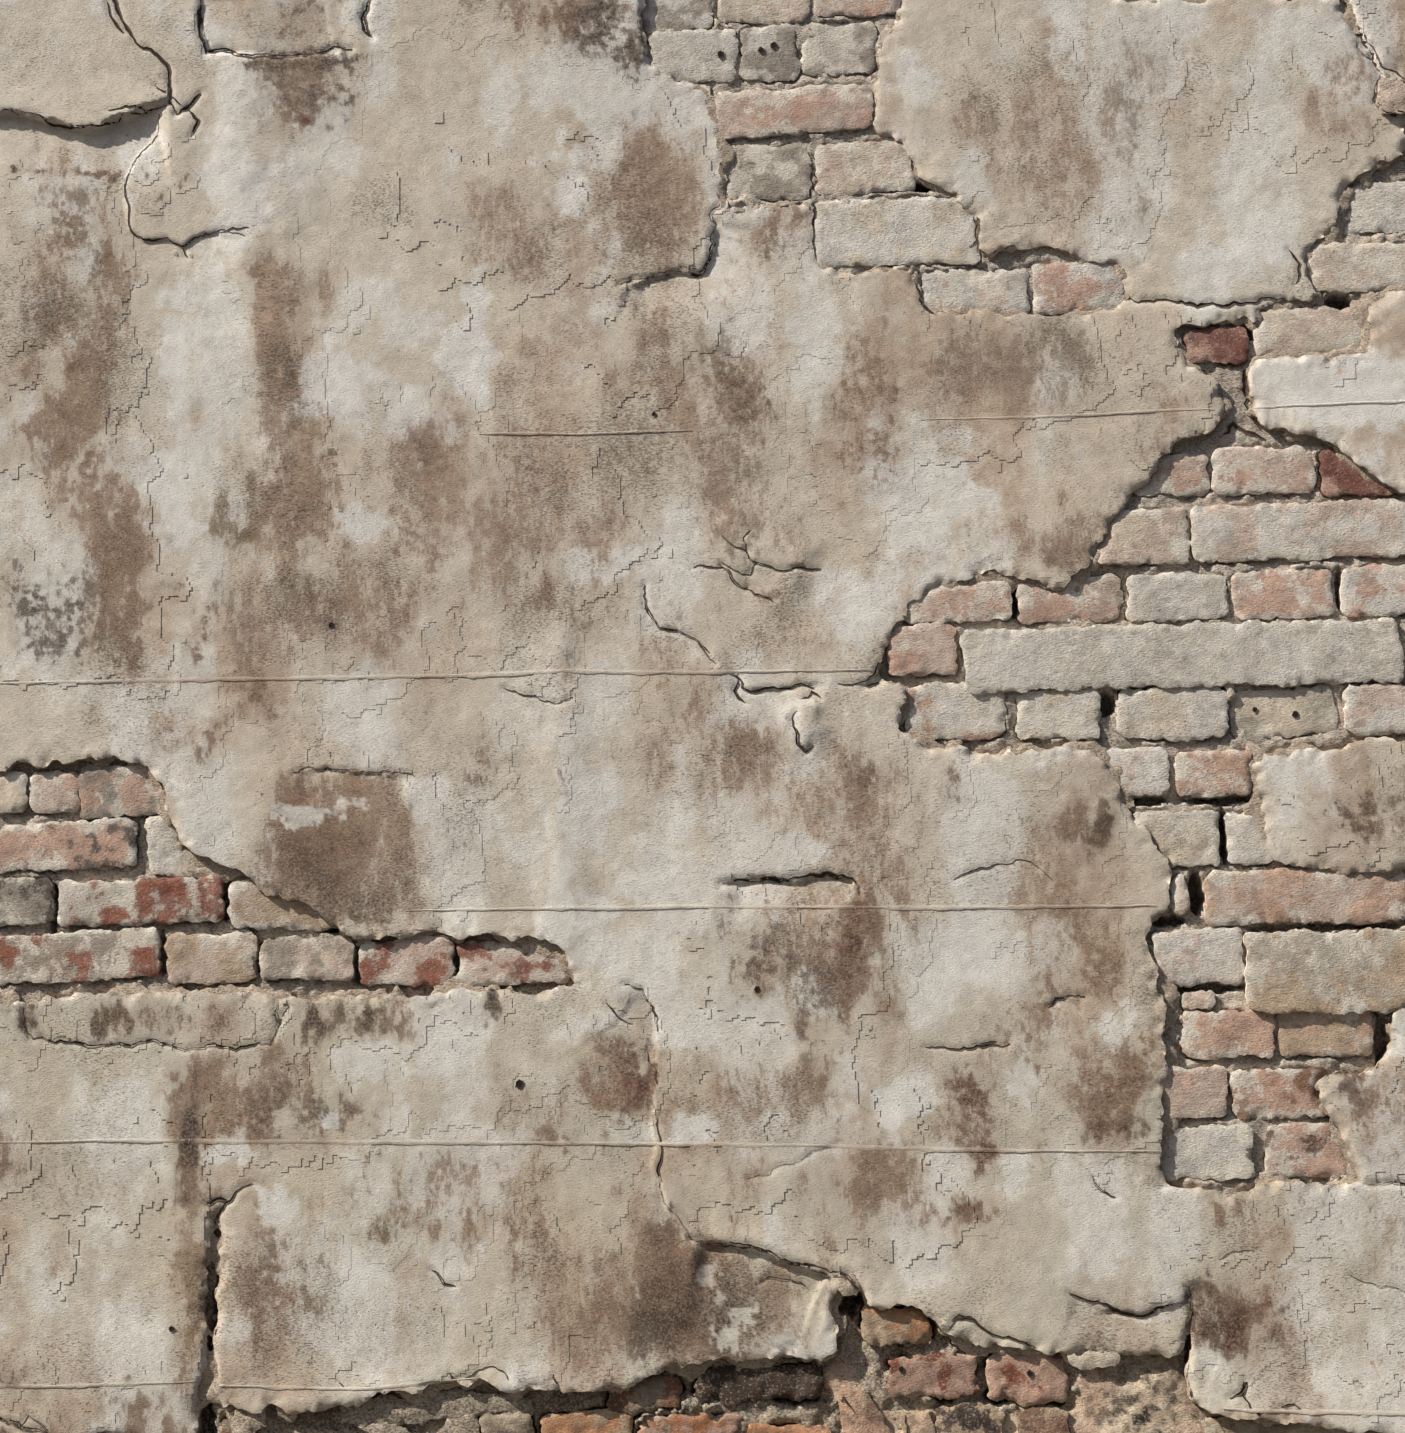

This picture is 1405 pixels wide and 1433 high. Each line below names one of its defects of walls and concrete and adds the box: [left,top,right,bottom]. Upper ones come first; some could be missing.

crack [0,0,244,258]
crack [197,0,372,59]
spalling [640,0,1144,317]
water stain [1108,310,1213,471]
water stain [0,0,1115,1433]
crack [643,585,879,753]
spalling [878,0,1405,1197]
spalling [0,756,579,1006]
water stain [982,750,1169,1192]
crack [656,1117,860,1292]
spalling [195,1204,1405,1433]
water stain [1173,1055,1405,1312]